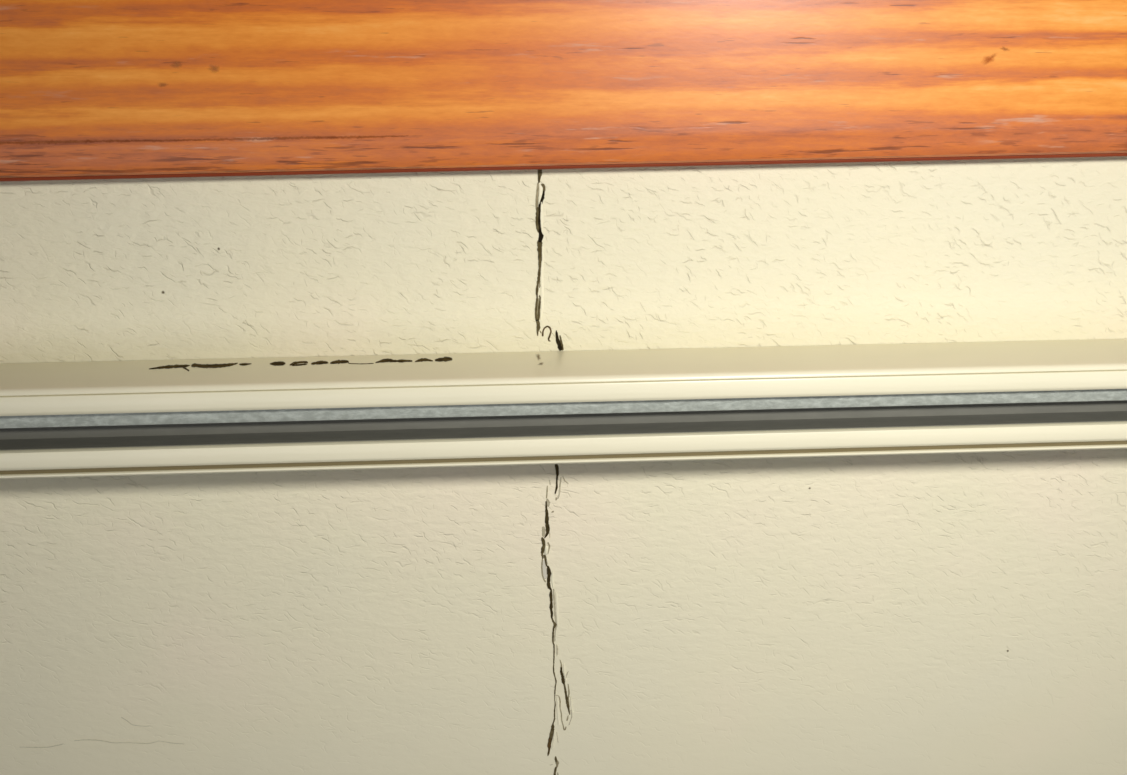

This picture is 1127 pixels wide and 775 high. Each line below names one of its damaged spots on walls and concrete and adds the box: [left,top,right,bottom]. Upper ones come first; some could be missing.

crack [535,170,564,351]
crack [541,464,573,775]